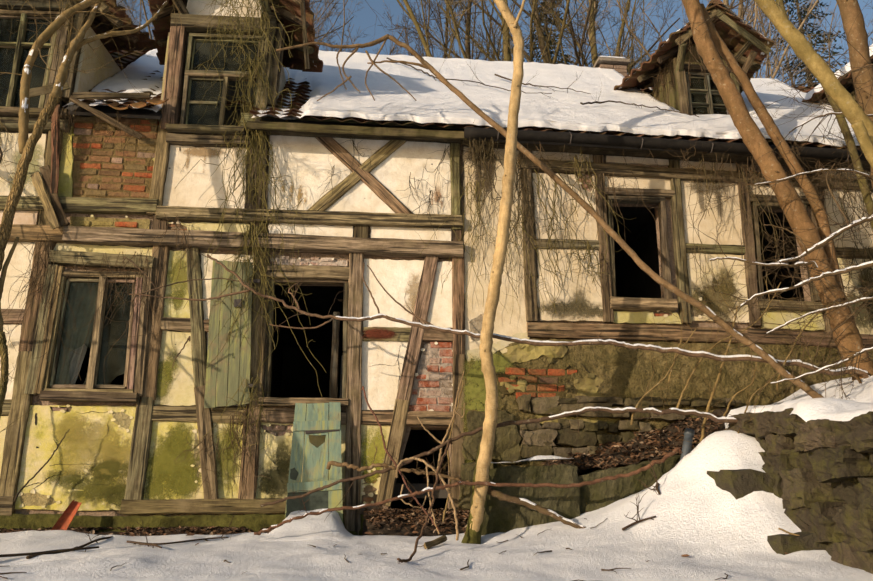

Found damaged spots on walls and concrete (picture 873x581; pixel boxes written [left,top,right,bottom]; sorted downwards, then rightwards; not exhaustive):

spalling [71,98,159,199]
leakage [541,291,603,319]
leakage [691,270,742,317]
flaking render [465,313,483,362]
leakage [165,351,179,379]
spalling [408,342,453,412]
spalling [492,332,604,400]
leakage [48,470,80,485]
leakage [93,461,128,508]
leakage [145,423,201,500]